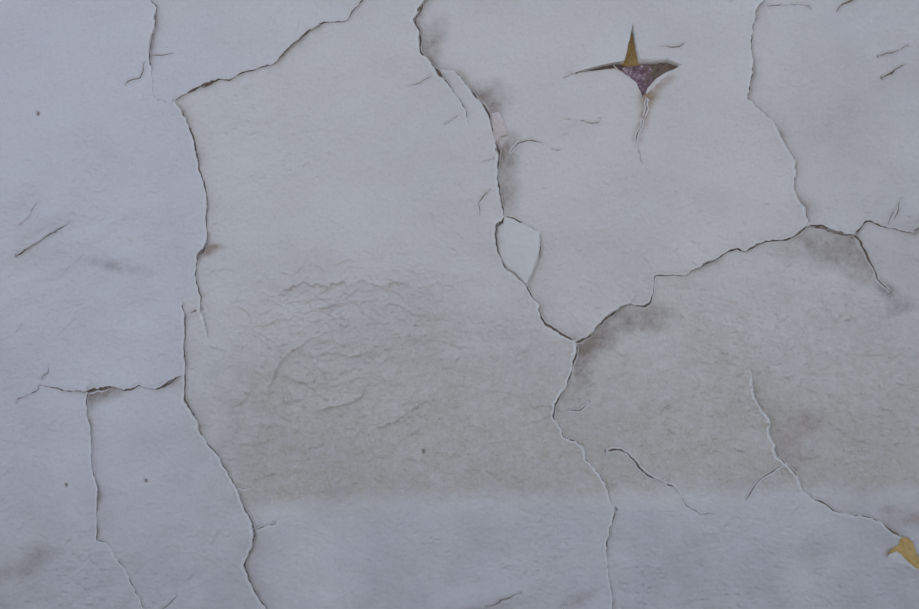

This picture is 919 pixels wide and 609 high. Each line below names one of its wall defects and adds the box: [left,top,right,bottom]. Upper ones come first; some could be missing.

crack [15,0,365,609]
flaking render [619,62,653,96]
crack [408,0,919,609]
peeling [887,536,919,570]